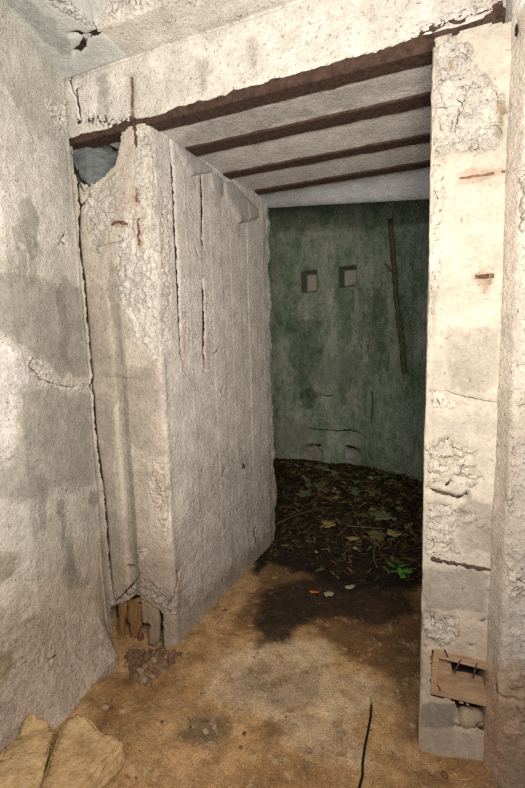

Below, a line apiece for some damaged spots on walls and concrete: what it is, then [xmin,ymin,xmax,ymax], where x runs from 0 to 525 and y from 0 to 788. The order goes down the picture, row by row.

spalling [48,0,94,28]
crack [72,22,101,51]
crack [55,77,81,126]
rust [459,170,506,180]
rust [111,218,141,245]
crack [168,139,203,354]
crack [201,282,218,360]
leakage [0,274,126,505]
crack [29,151,140,601]
rust [431,556,491,571]
spalling [132,578,179,615]